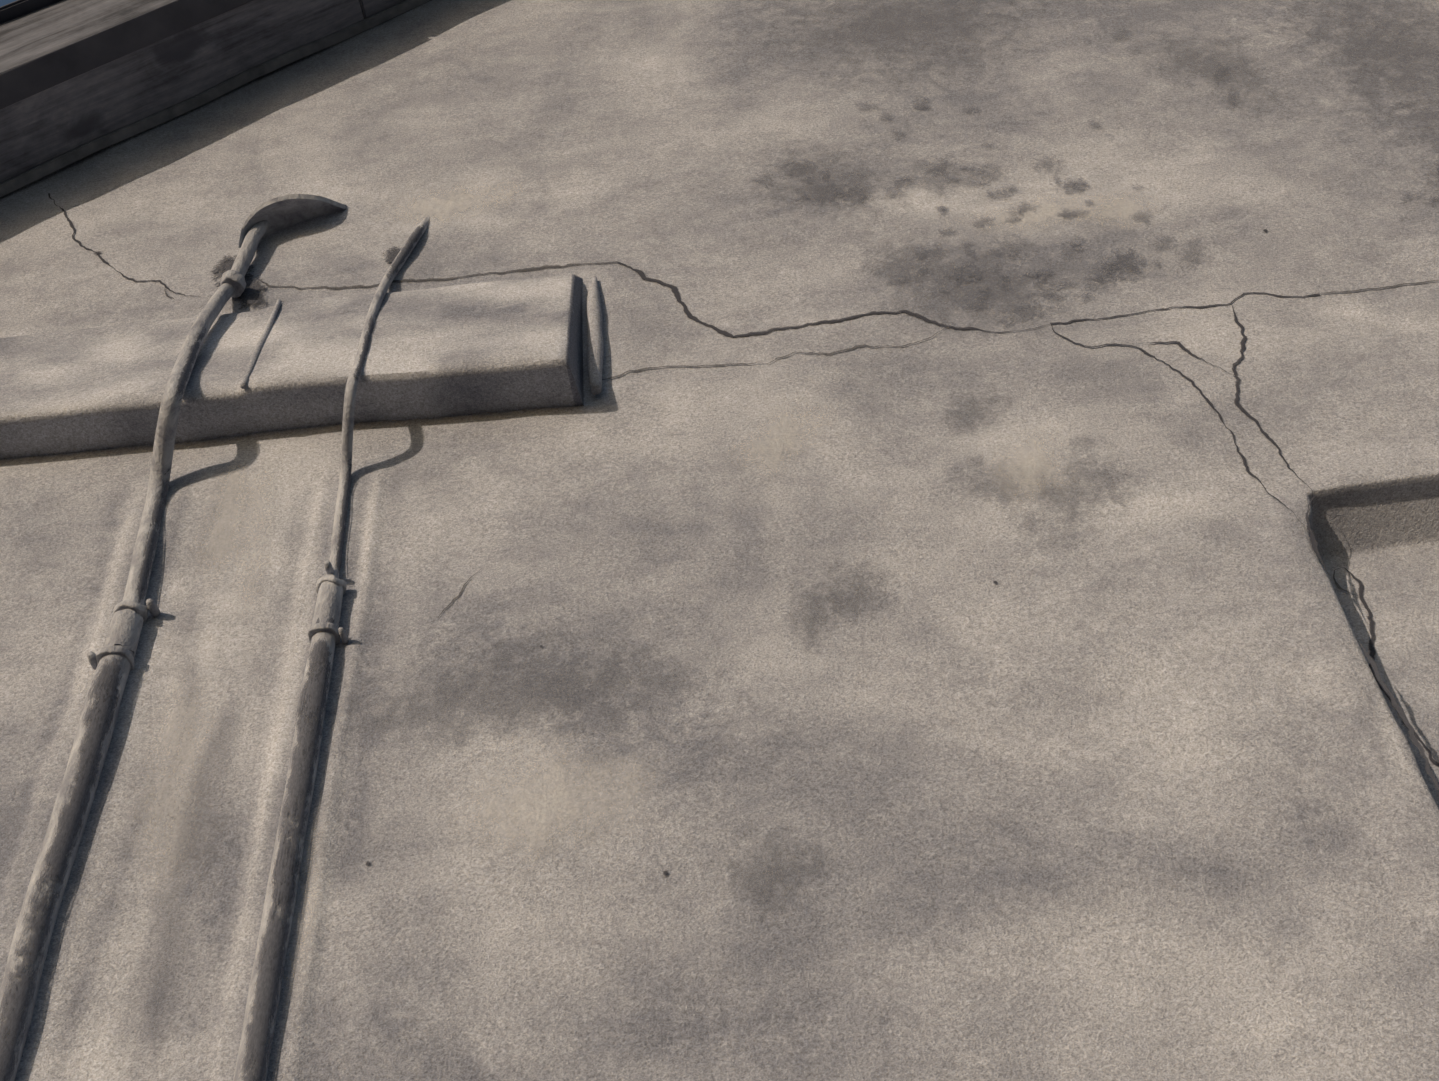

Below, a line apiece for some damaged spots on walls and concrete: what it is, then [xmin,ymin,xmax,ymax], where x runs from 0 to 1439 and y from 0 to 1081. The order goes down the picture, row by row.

crack [48,193,201,300]
crack [259,261,1439,790]